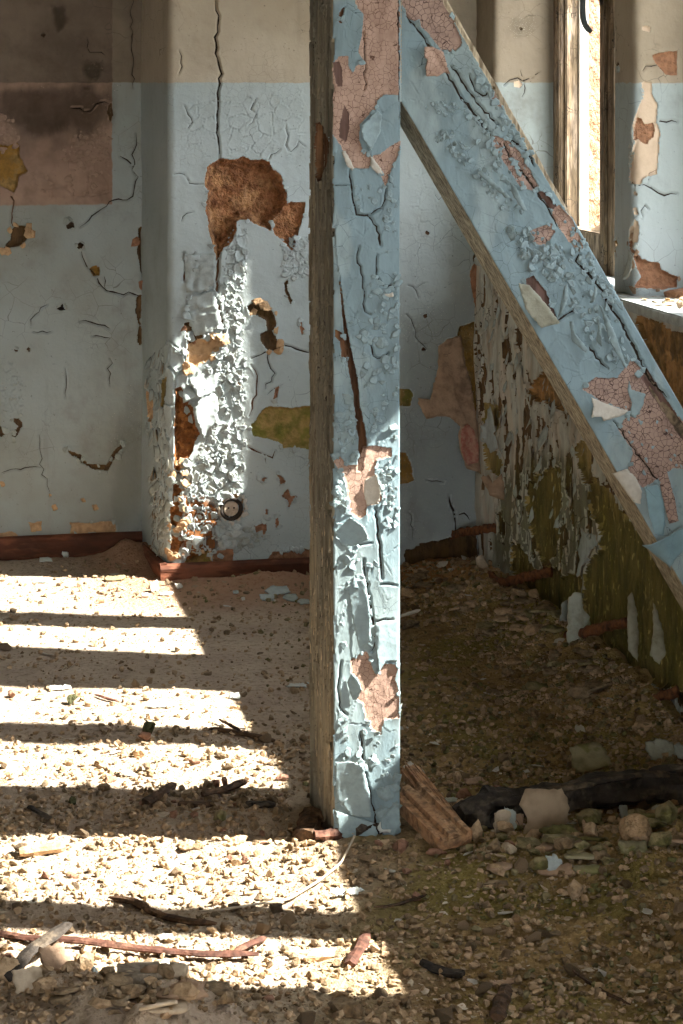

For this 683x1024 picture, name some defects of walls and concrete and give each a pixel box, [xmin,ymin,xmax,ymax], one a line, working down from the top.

spalling [0,222,35,256]
crack [80,136,140,297]
crack [186,1,222,154]
crack [446,66,557,226]
peeling [328,0,683,489]
crack [83,320,112,383]
spalling [144,156,327,563]
crack [4,436,50,494]
peeling [259,254,624,864]
peeling [627,592,666,668]
crack [315,653,376,823]
peeling [0,650,353,1024]